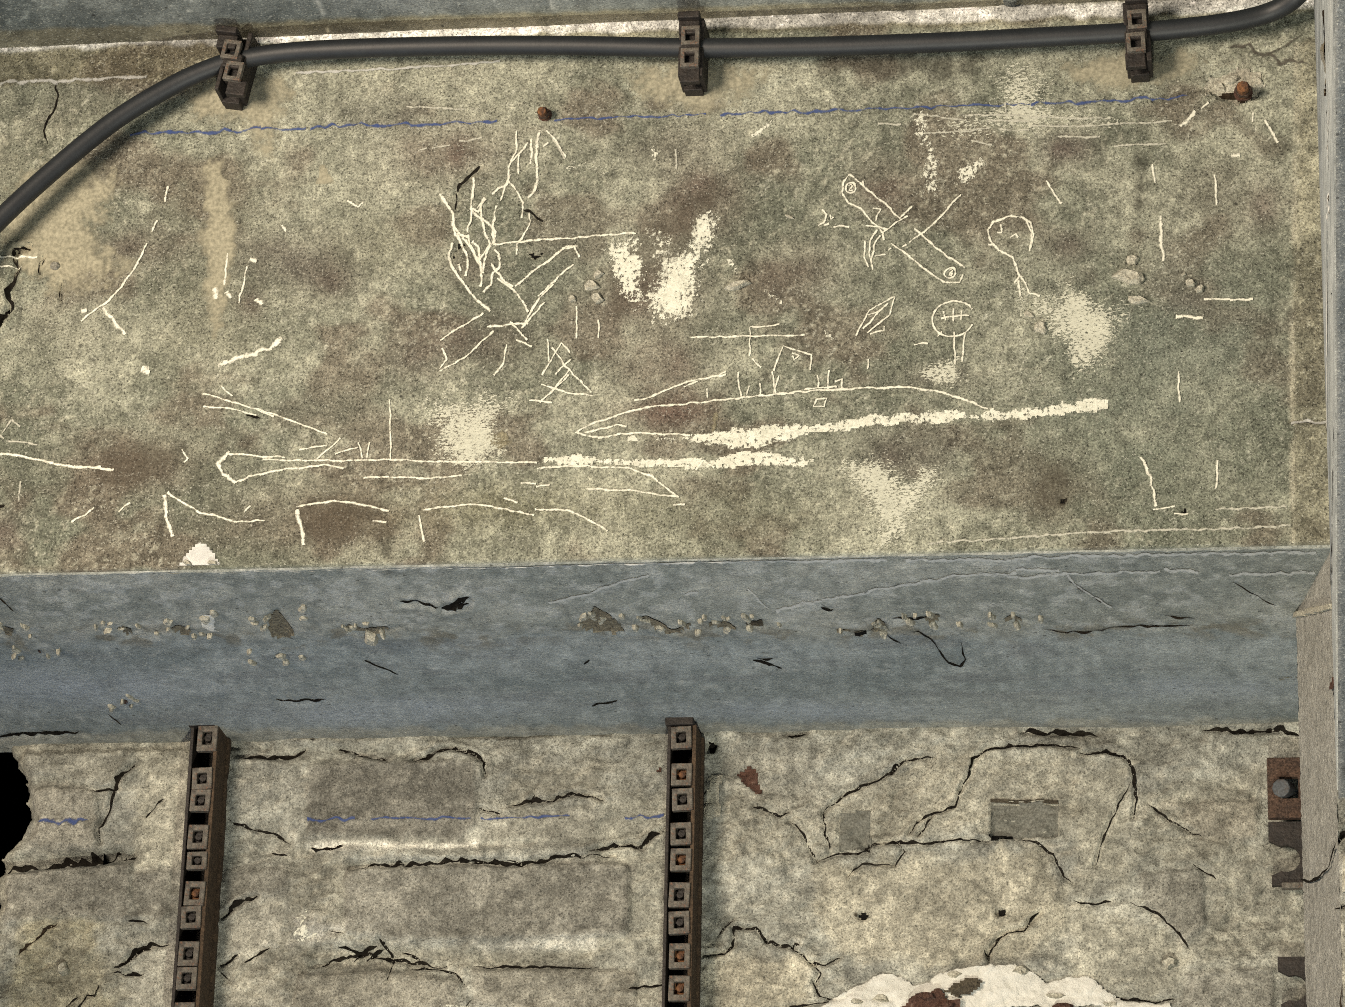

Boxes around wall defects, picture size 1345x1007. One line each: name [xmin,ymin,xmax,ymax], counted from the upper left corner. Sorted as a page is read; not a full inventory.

crack [0,247,62,327]
spalling [94,610,218,640]
spalling [248,604,308,666]
spalling [341,622,389,646]
spalling [577,607,782,637]
spalling [836,619,888,639]
crack [8,765,137,874]
crack [228,819,664,869]
crack [753,728,1216,949]
crack [318,931,597,1006]
crack [707,920,839,1007]
flaking render [902,978,983,1007]